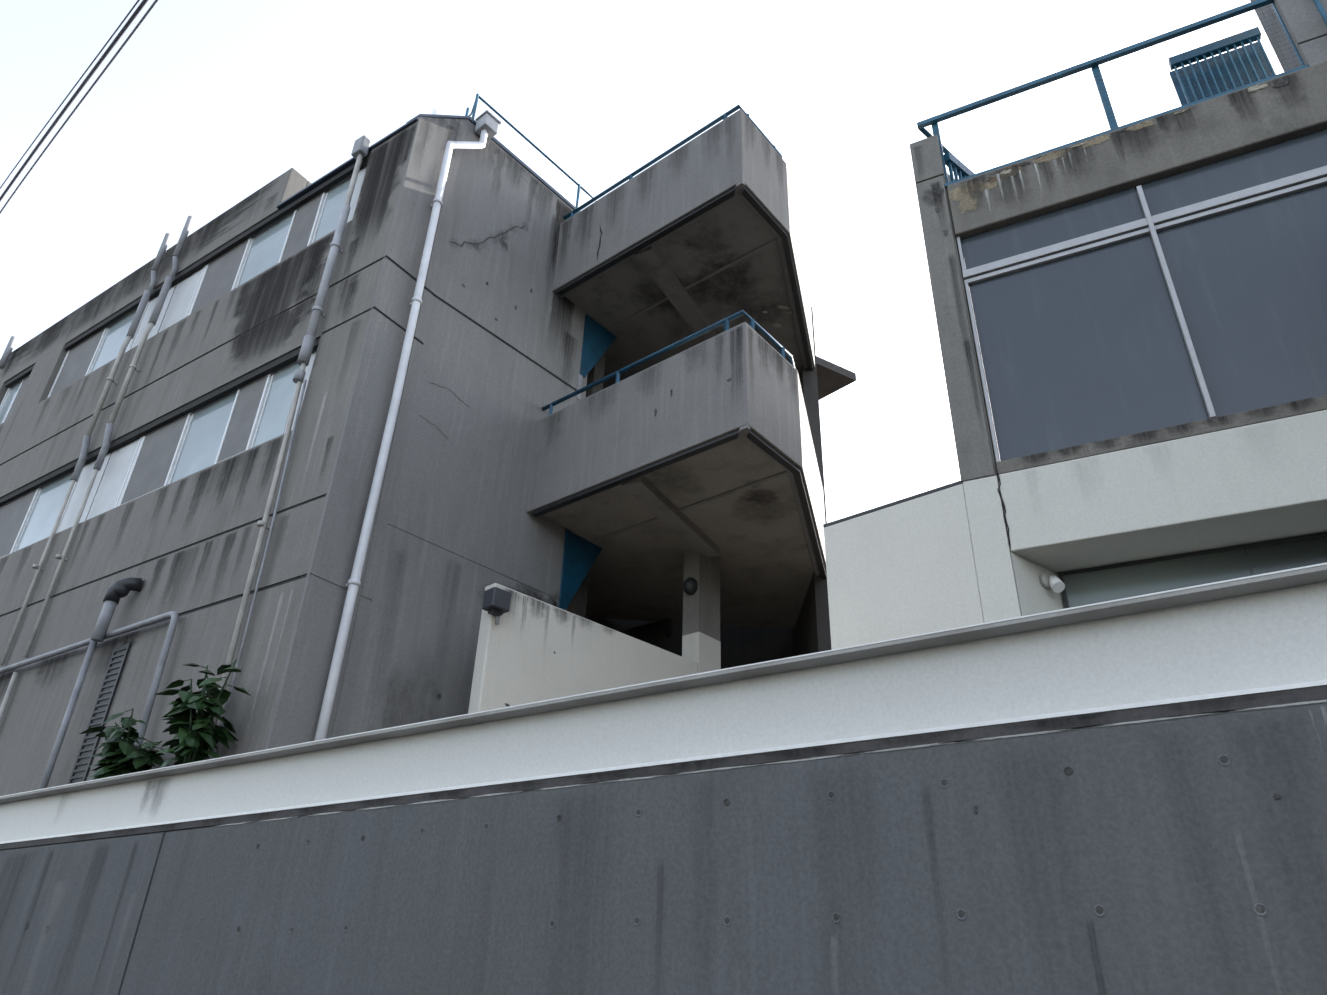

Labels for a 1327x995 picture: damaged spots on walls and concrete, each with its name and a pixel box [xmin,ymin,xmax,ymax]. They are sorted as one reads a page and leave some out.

spalling [1248,80,1290,92]
peeling [935,121,1153,212]
crack [449,225,525,250]
damp [234,234,334,351]
crack [997,474,1011,549]